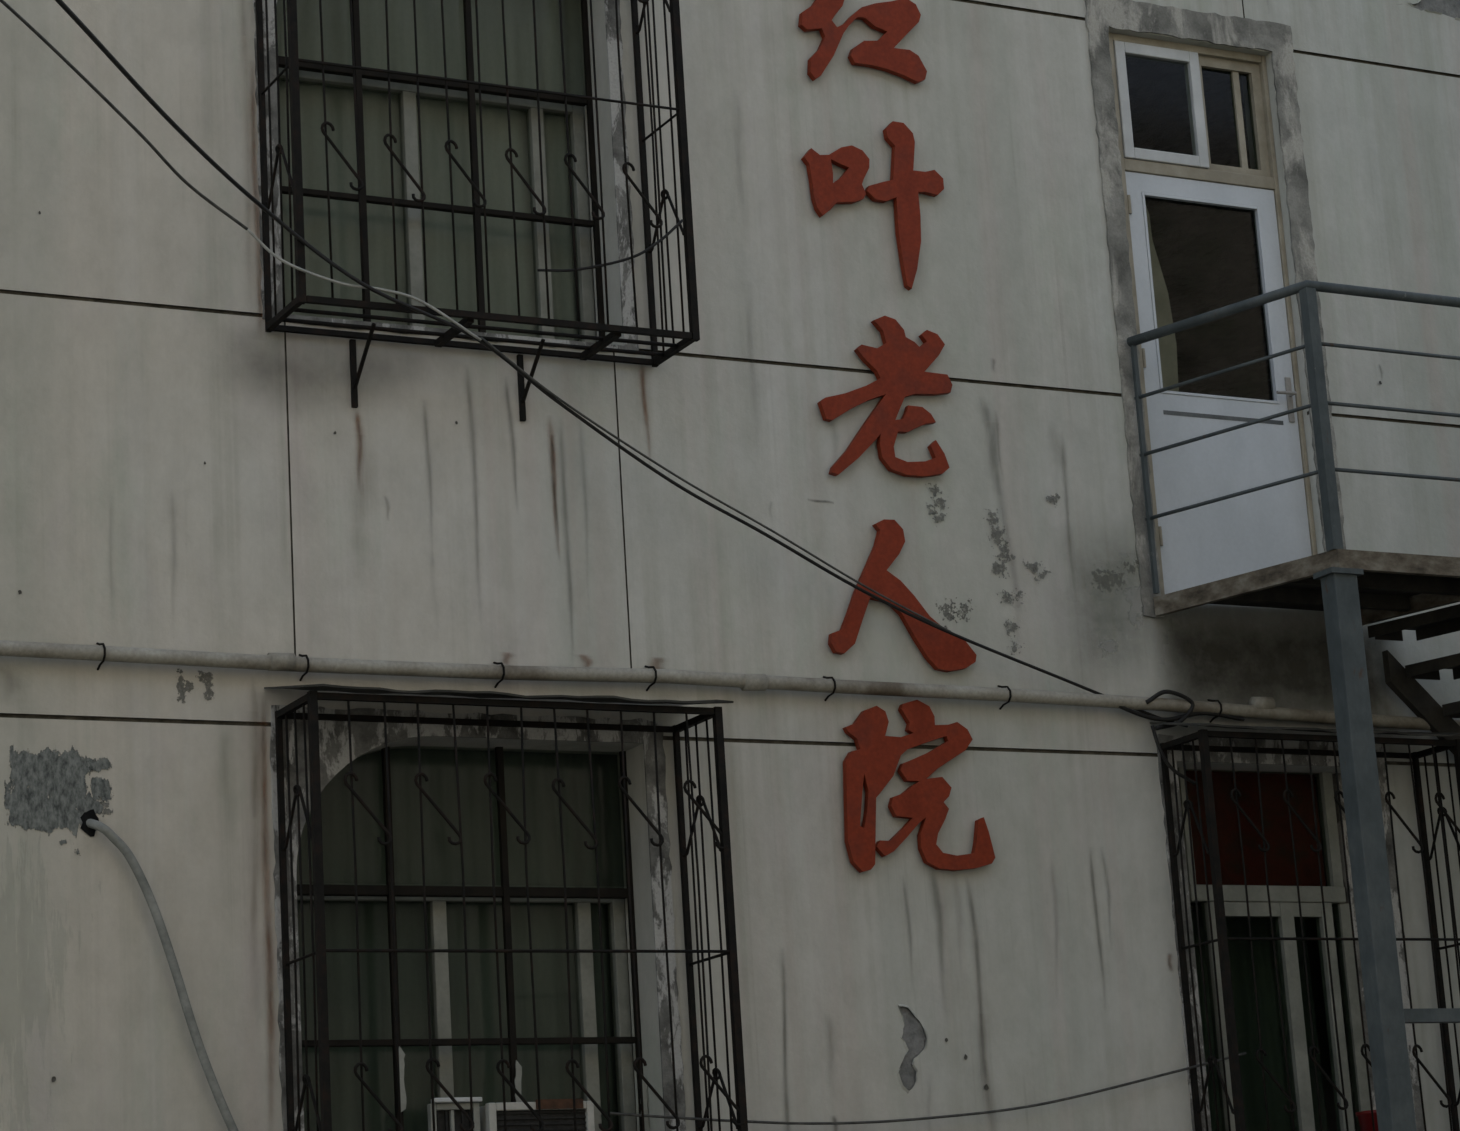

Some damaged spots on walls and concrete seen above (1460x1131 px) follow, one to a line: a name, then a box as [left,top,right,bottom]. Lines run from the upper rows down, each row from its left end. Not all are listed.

spalling [1408,0,1460,21]
peeling [925,483,949,527]
peeling [986,509,1050,655]
peeling [936,597,976,628]
peeling [176,669,214,703]
peeling [59,757,113,855]
spalling [897,1004,948,1093]